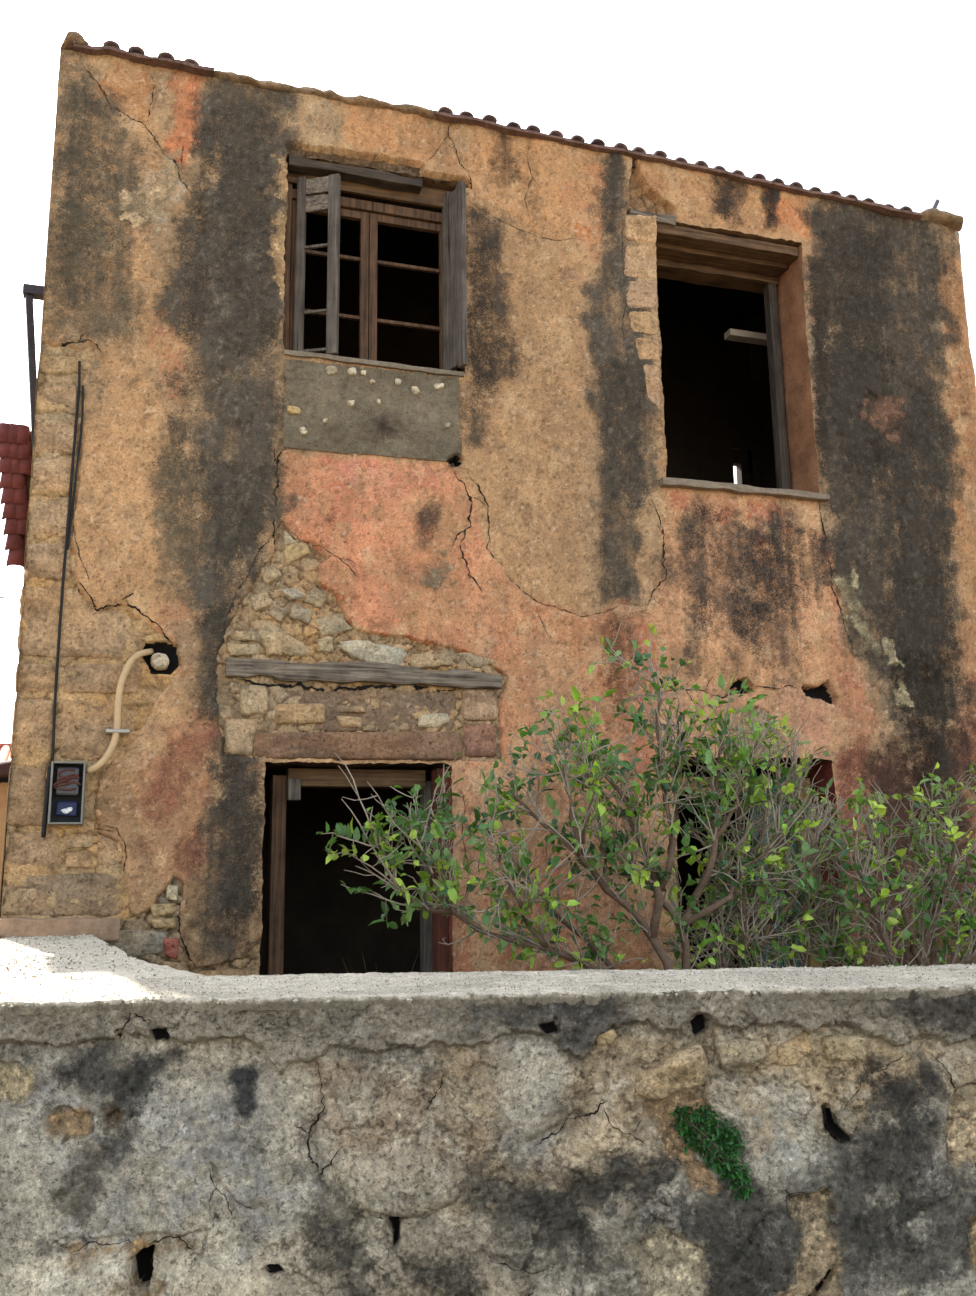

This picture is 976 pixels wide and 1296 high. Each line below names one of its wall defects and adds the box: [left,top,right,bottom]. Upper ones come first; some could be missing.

crack [82,63,189,191]
crack [73,525,180,665]
spalling [1,342,261,976]
leakage [45,49,299,961]
spalling [215,524,506,764]
crack [452,469,667,639]
leakage [581,153,663,705]
leakage [657,199,976,967]
leakage [102,1053,153,1163]
leakage [177,1076,245,1179]
leakage [839,1068,955,1267]